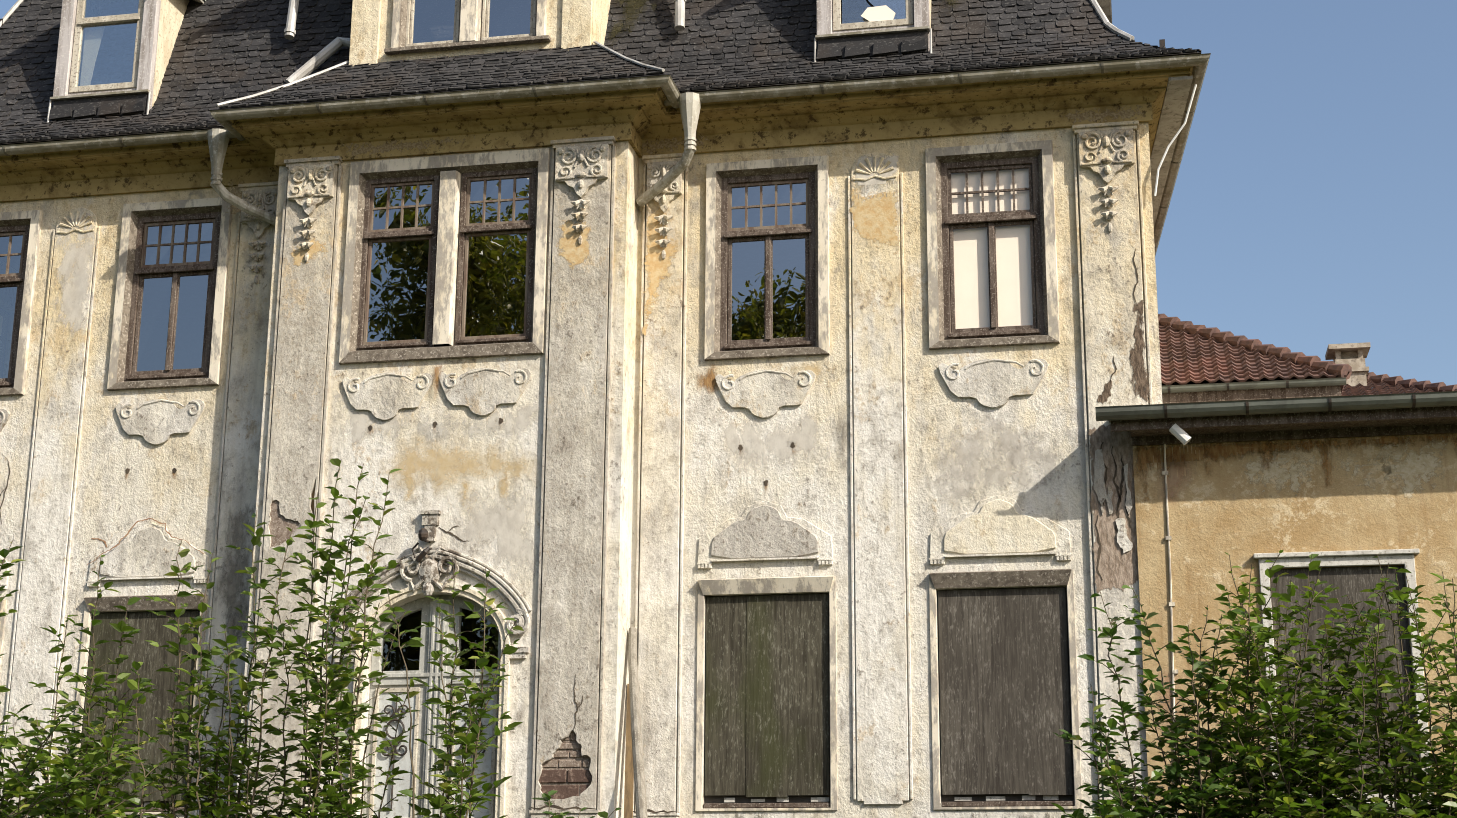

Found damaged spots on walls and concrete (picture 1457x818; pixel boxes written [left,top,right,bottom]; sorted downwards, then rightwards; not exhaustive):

peeling [849,156,900,246]
spalling [1097,249,1150,403]
flaking render [269,483,316,557]
damp [395,449,523,498]
flaking render [1089,424,1139,593]
flaking render [535,728,599,799]